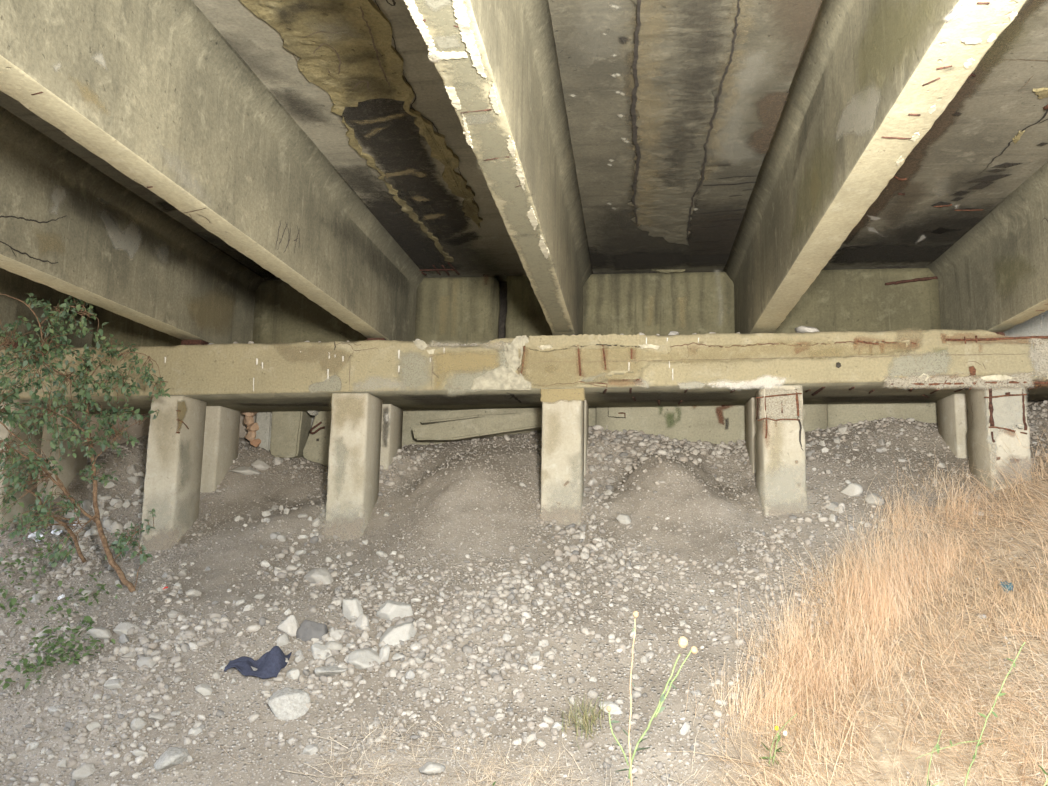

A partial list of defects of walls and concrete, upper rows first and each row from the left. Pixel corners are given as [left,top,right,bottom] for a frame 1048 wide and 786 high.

crack [619,0,641,224]
crack [649,0,756,274]
crack [979,109,1048,174]
peeling [413,0,672,404]
crack [0,215,67,264]
water stain [205,239,274,277]
water stain [604,203,739,265]
water stain [857,205,989,263]
spalling [941,335,1048,344]